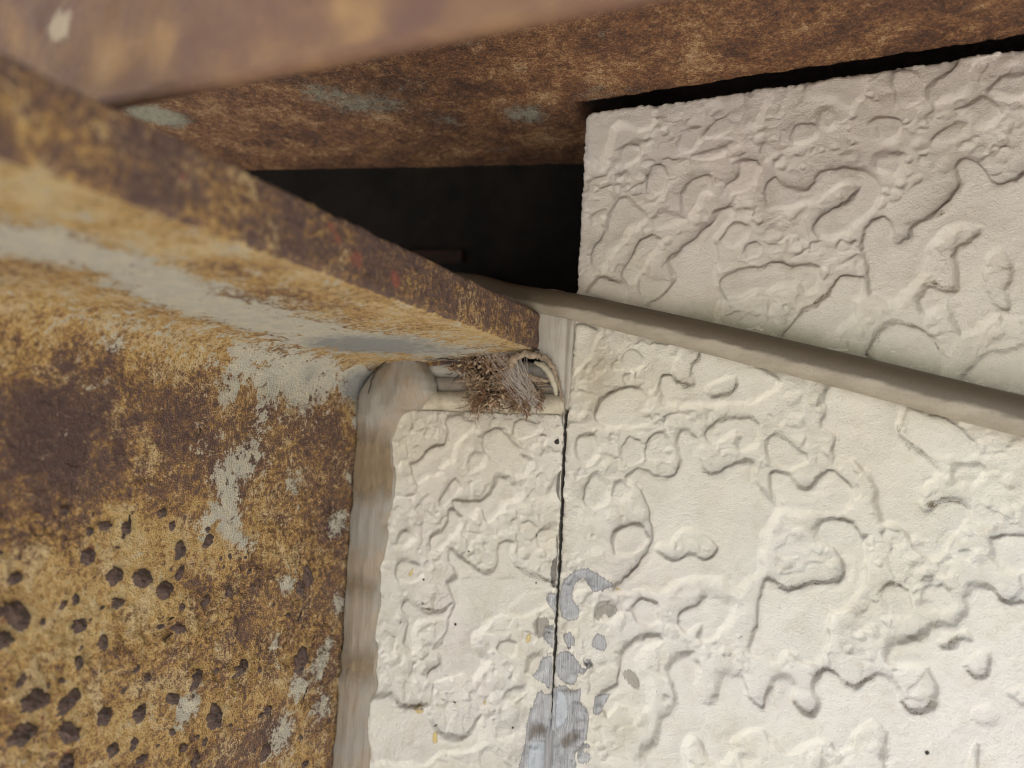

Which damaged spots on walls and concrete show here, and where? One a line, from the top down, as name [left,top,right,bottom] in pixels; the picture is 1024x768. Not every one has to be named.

corrosion [354,436,393,497]
corrosion [202,526,214,549]
corrosion [0,600,46,650]
corrosion [71,508,187,671]
peeling [595,604,617,620]
peeling [519,535,613,768]
corrosion [165,659,262,705]
corrosion [3,673,81,768]
corrosion [96,707,113,727]
corrosion [106,737,160,765]
corrosion [132,703,146,724]
corrosion [169,703,233,768]